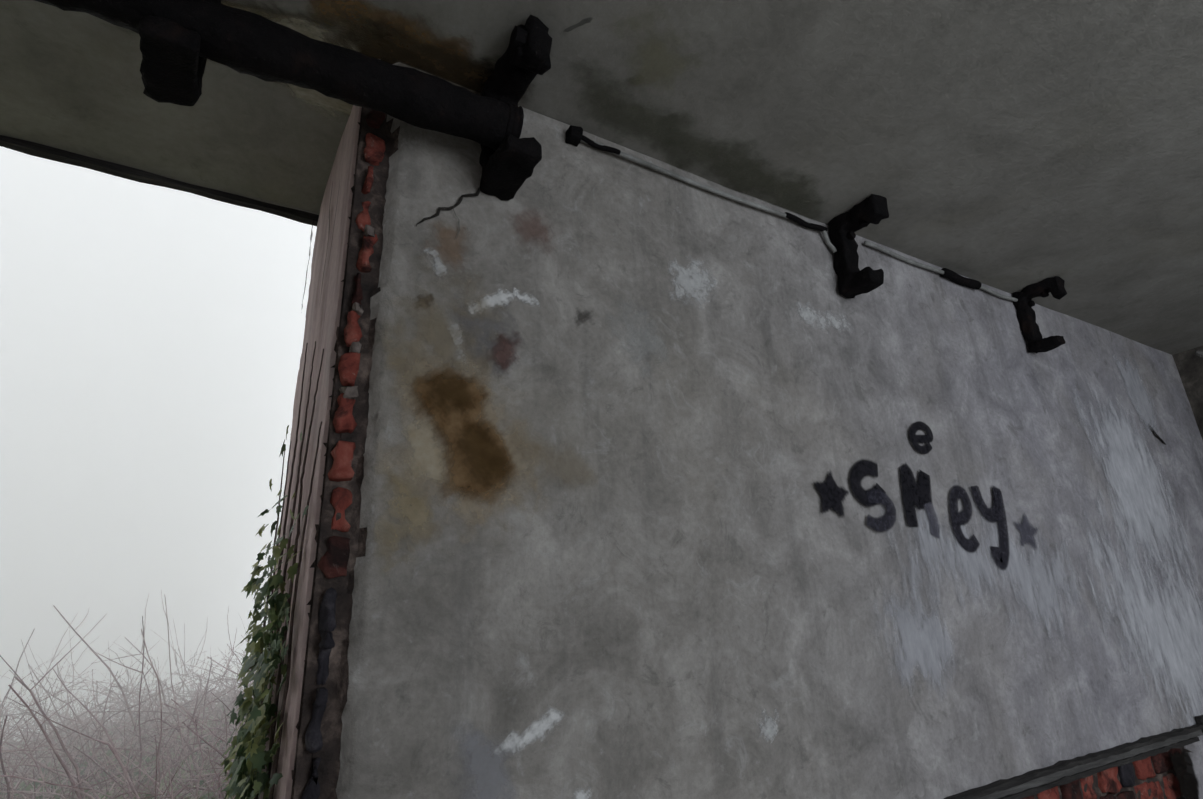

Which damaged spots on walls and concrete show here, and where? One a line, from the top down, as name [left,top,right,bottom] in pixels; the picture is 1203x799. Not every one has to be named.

crack [416,187,481,239]
spalling [293,107,391,799]
spalling [1022,746,1199,799]